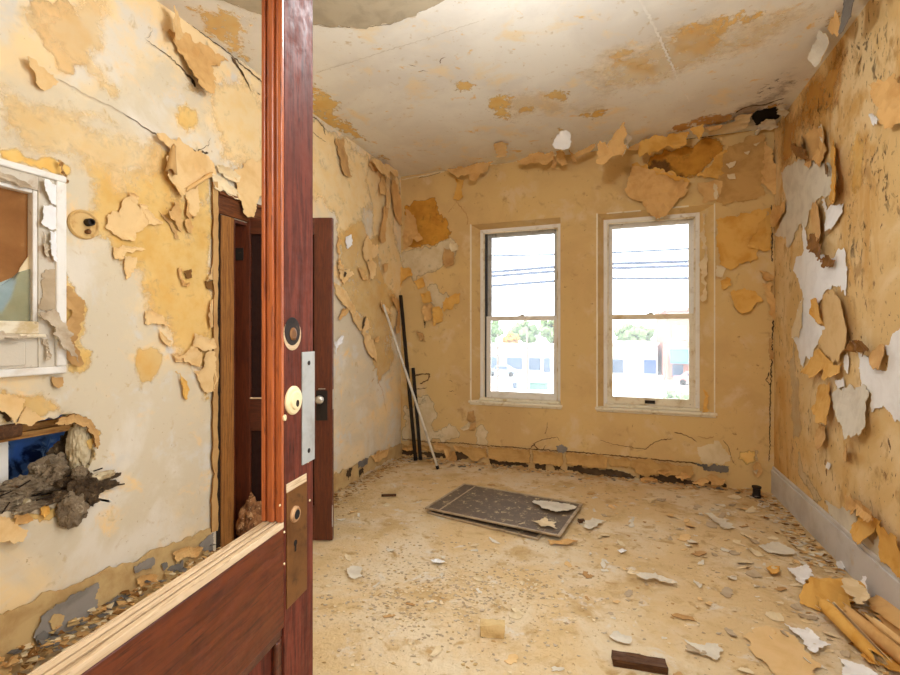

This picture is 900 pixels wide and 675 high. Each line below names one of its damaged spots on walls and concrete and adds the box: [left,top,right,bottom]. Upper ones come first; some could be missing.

crack [148,33,196,87]
crack [187,22,262,95]
spalling [313,0,444,29]
damp [672,10,763,57]
crack [58,79,156,134]
damp [647,137,724,178]
damp [672,114,733,132]
damp [781,54,843,166]
peeling [105,133,262,280]
peeling [447,98,900,461]
spalling [0,394,125,544]
flaking render [0,528,214,674]